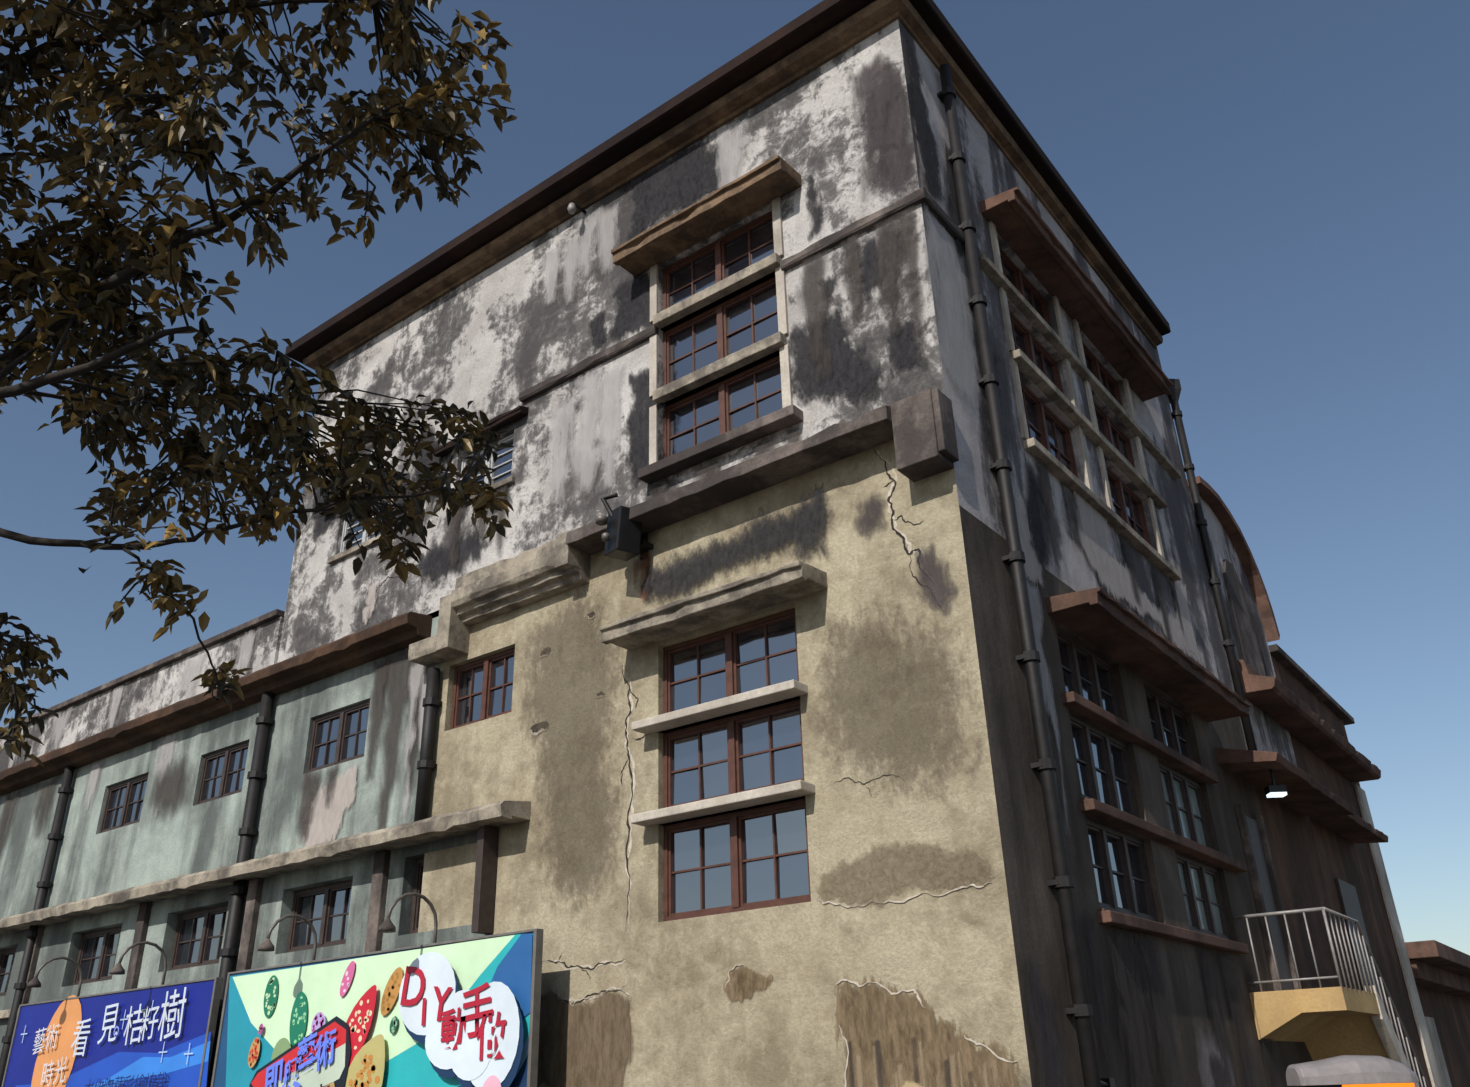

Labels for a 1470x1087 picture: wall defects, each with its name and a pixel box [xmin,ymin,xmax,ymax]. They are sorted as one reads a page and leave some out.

leakage [849,40,965,258]
leakage [788,175,924,405]
leakage [311,479,336,542]
leakage [362,581,379,624]
leakage [393,426,446,524]
leakage [416,485,512,586]
crack [874,449,944,613]
leakage [917,544,957,613]
flaking render [815,842,991,908]
flaking render [537,989,632,1087]
flaking render [723,964,773,1002]
flaking render [835,977,1019,1087]